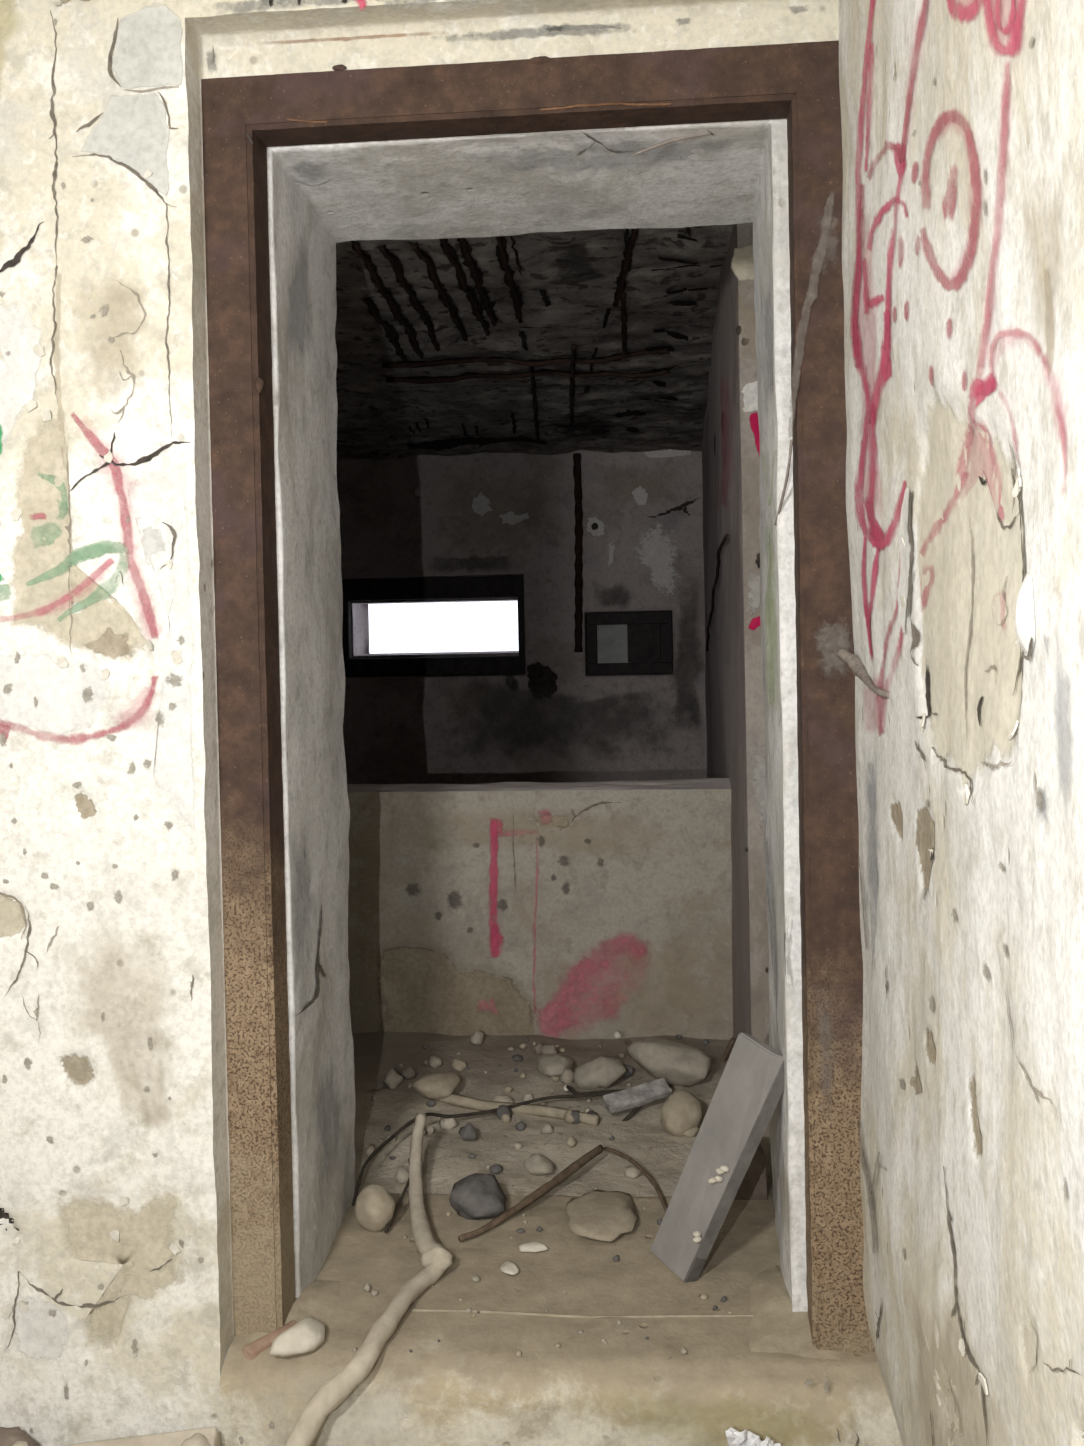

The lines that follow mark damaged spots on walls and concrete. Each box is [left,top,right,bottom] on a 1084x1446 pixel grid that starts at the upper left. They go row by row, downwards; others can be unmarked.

flaking render [108,5,182,93]
crack [0,11,190,651]
spalling [352,228,669,440]
water stain [675,616,700,723]
crack [999,960,1057,1126]
crack [943,1166,989,1445]